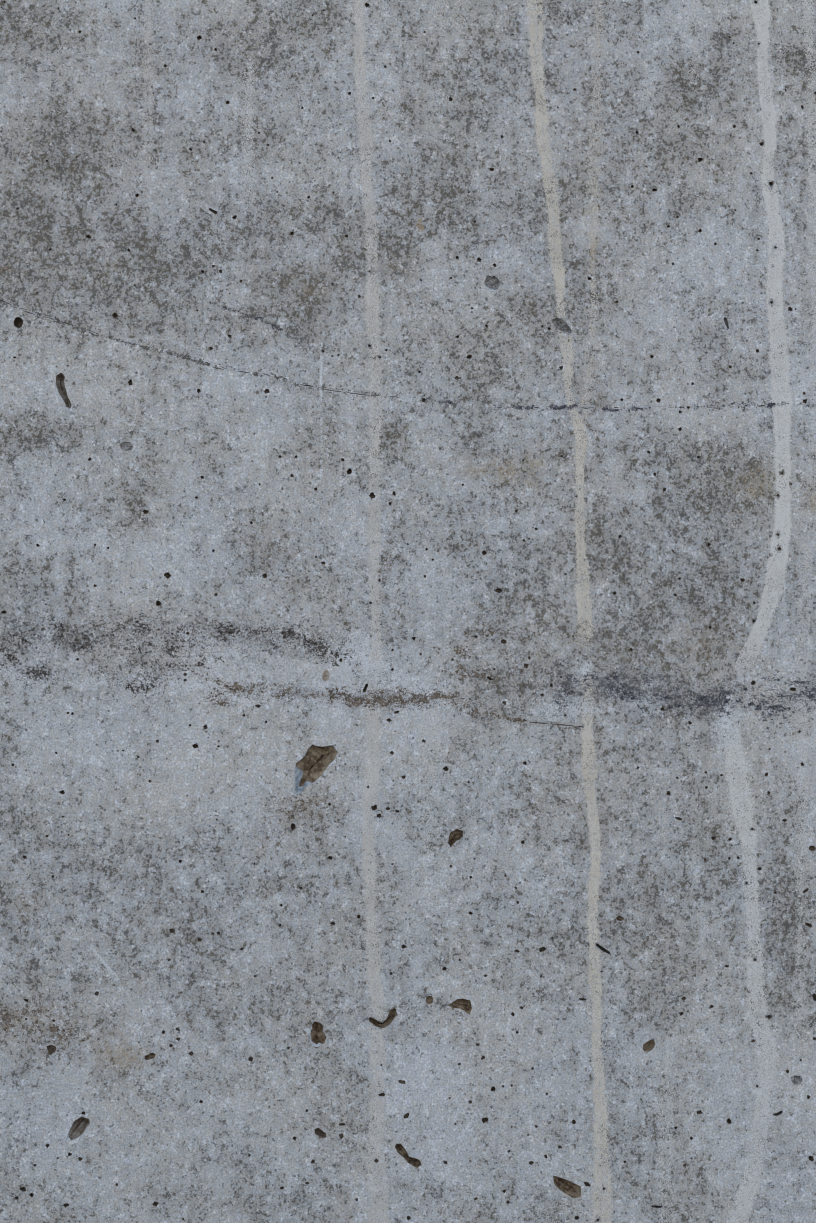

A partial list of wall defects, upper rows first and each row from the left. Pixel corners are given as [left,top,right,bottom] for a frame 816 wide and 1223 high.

leakage [0,0,527,1021]
leakage [424,0,816,1223]
leakage [365,1023,390,1223]